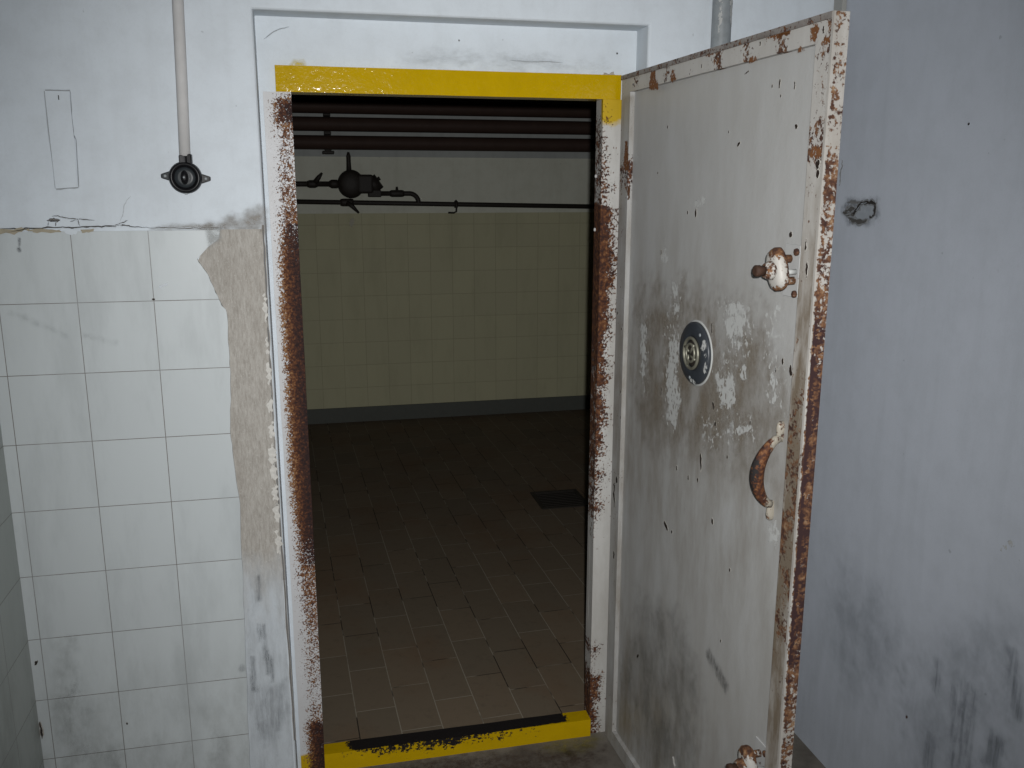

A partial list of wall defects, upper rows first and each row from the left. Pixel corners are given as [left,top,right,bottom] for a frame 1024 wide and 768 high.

flaking render [843,198,877,227]
flaking render [198,229,294,768]